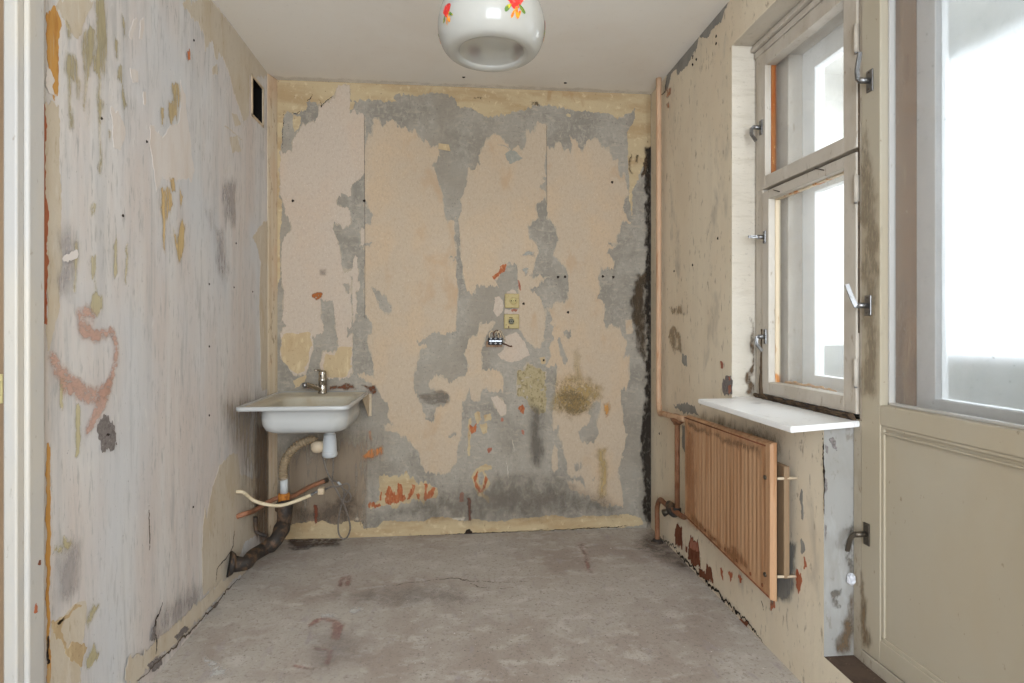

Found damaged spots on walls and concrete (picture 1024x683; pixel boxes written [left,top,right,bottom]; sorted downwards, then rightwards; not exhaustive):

peeling [182,0,268,153]
spalling [666,3,728,91]
peeling [44,66,63,351]
peeling [493,280,521,318]
peeling [498,332,546,364]
damp [554,378,609,414]
damp [629,147,651,523]
peeling [368,471,438,510]
peeling [459,447,492,502]
peeling [34,443,99,683]
crack [137,531,240,681]
crack [660,536,764,643]